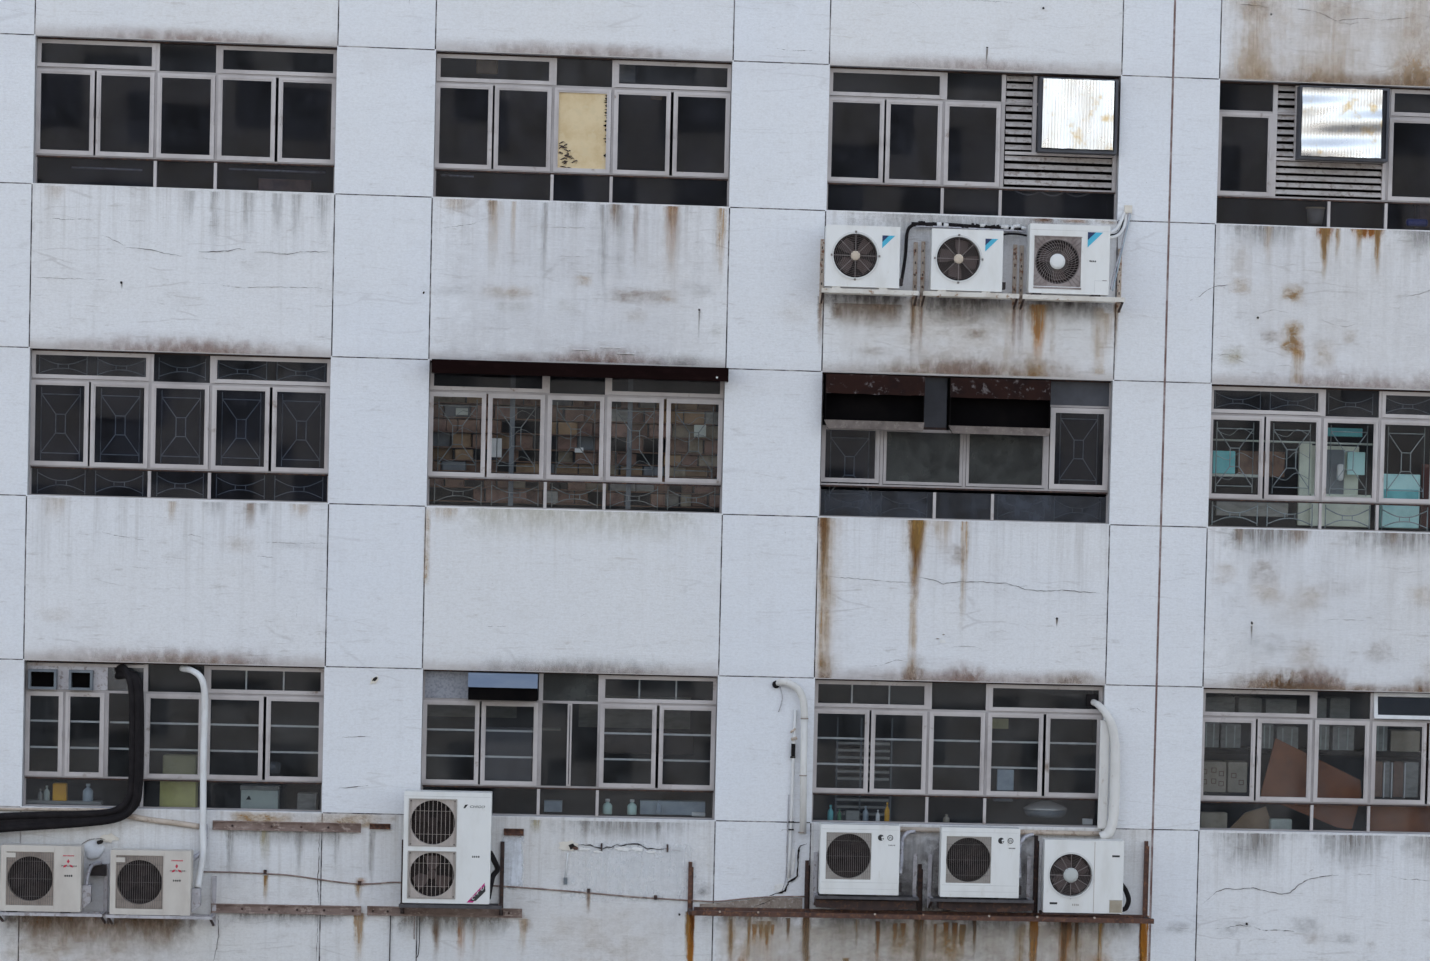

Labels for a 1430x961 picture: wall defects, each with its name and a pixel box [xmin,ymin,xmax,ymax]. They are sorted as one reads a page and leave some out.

rust [1318,228,1382,262]
rust [1013,304,1045,343]
rust [1283,325,1299,351]
rust [911,520,924,574]
rust [820,517,829,634]
leakage [1250,674,1369,691]
rust [685,913,694,961]
rust [728,917,809,961]
rust [875,920,977,961]
rust [1019,922,1038,961]